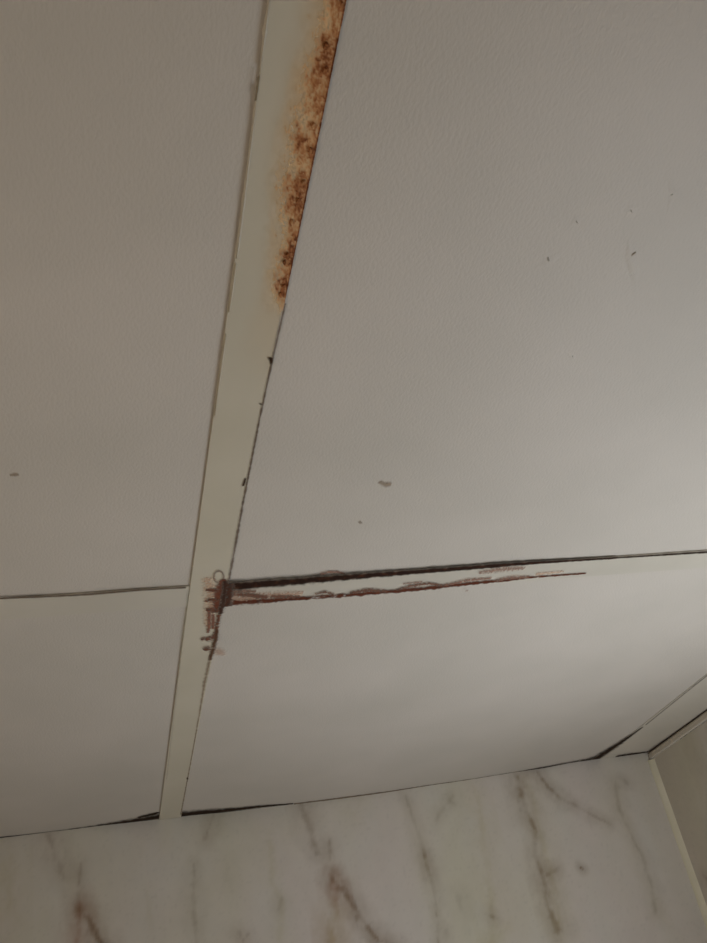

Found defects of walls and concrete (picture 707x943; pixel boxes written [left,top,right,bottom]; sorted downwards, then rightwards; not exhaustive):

corrosion [273,0,347,310]
corrosion [201,557,618,661]